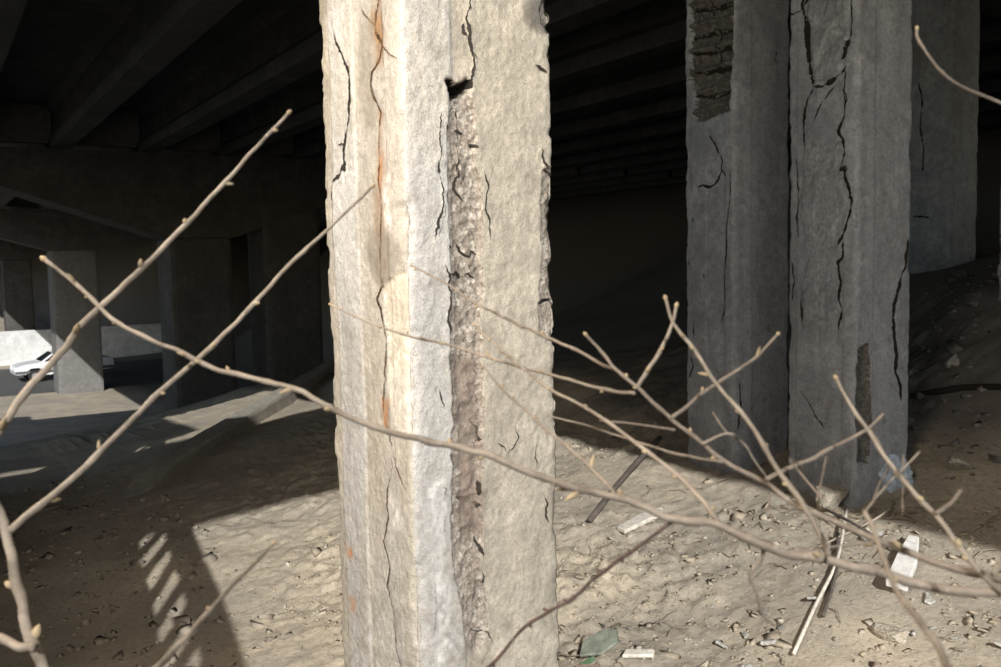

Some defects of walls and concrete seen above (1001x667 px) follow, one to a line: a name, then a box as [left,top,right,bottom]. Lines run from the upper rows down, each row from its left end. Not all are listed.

corrosion [372,15,383,53]
crack [460,0,478,86]
spalling [688,0,734,122]
crack [435,111,491,333]
crack [790,0,853,331]
crack [331,0,406,667]
spalling [447,92,488,650]
crack [470,420,538,470]
crack [735,383,743,430]
crack [892,215,930,400]
crack [441,479,482,545]
crack [473,536,485,583]